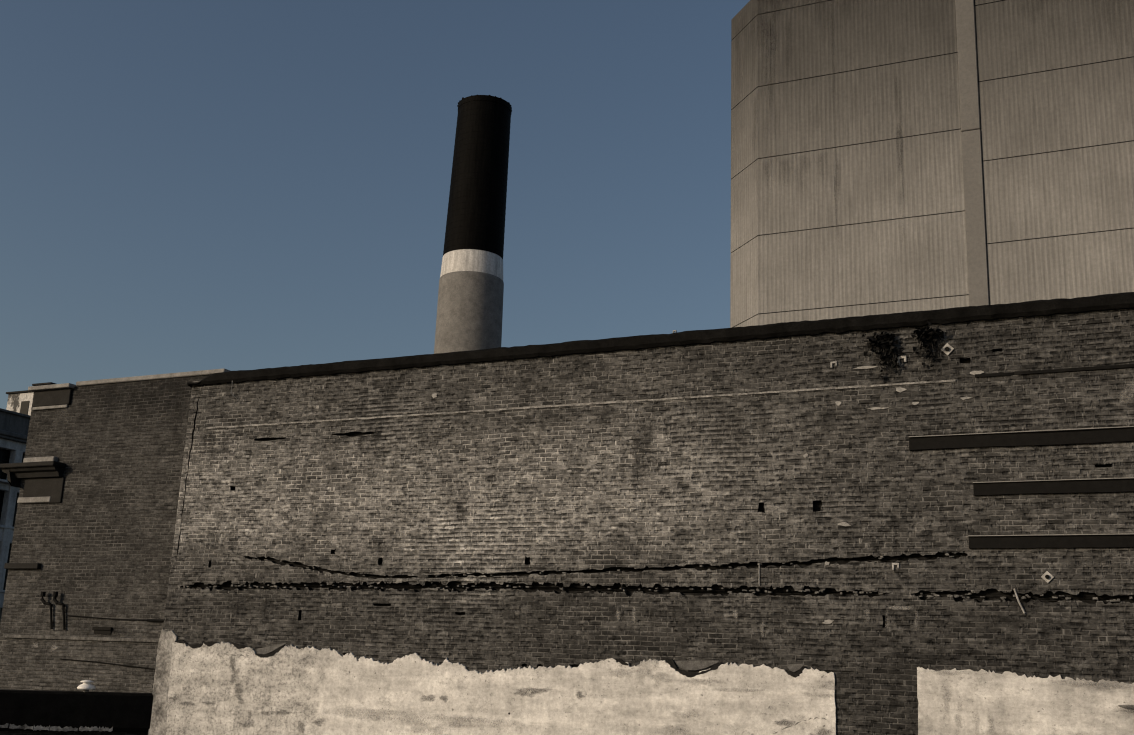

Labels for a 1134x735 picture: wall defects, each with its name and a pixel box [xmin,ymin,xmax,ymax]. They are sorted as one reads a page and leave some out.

crack [176,397,1134,604]
peeling [664,658,722,678]